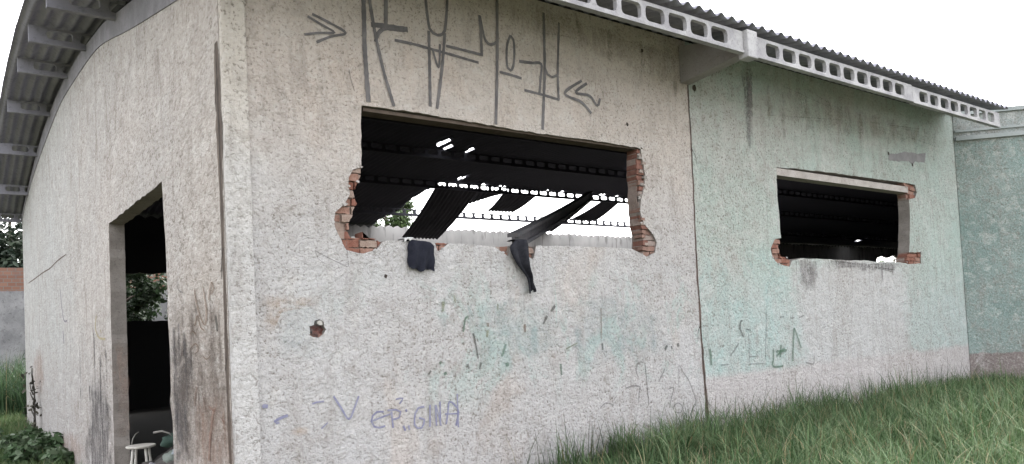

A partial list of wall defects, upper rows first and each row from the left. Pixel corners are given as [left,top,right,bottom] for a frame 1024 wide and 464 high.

flaking render [333,166,381,253]
flaking render [626,149,655,257]
flaking render [893,183,916,201]
flaking render [771,238,790,266]
flaking render [896,252,922,264]
spalling [309,320,323,338]